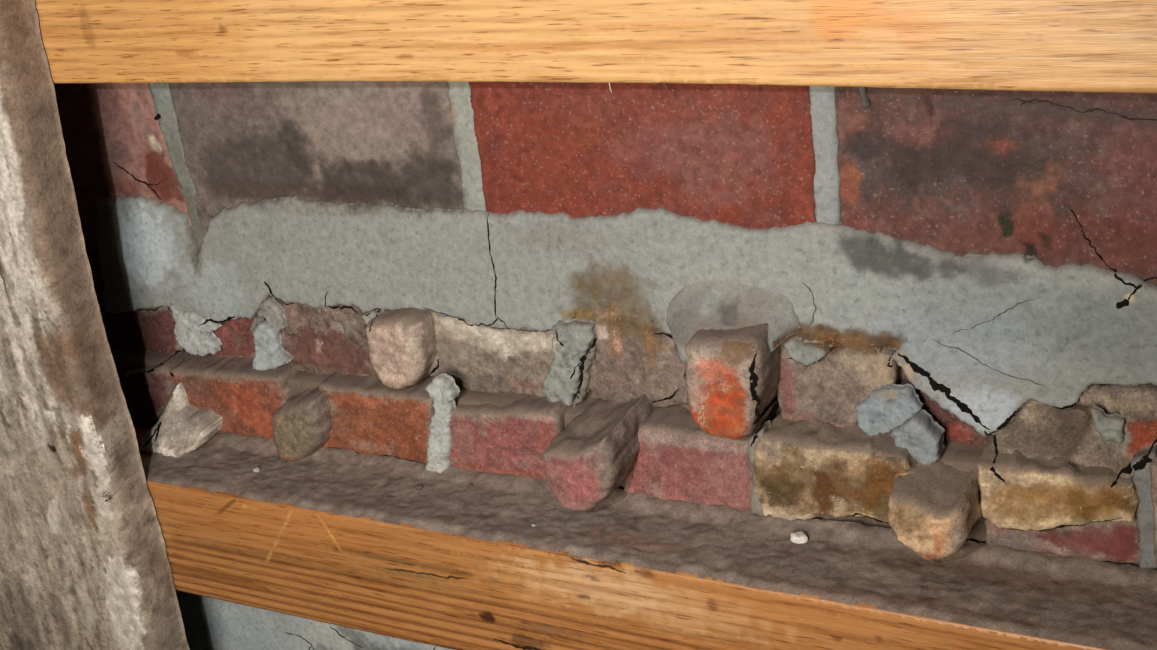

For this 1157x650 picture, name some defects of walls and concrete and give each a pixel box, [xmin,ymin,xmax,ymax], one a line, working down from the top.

crack [113,162,160,199]
crack [1069,208,1157,301]
peeling [170,303,223,356]
peeling [250,297,294,370]
crack [425,210,597,427]
peeling [542,320,598,407]
crack [937,299,1084,410]
peeling [138,382,223,458]
peeling [425,373,460,473]
peeling [855,384,945,465]
crack [887,349,1019,483]
damp [760,460,904,521]